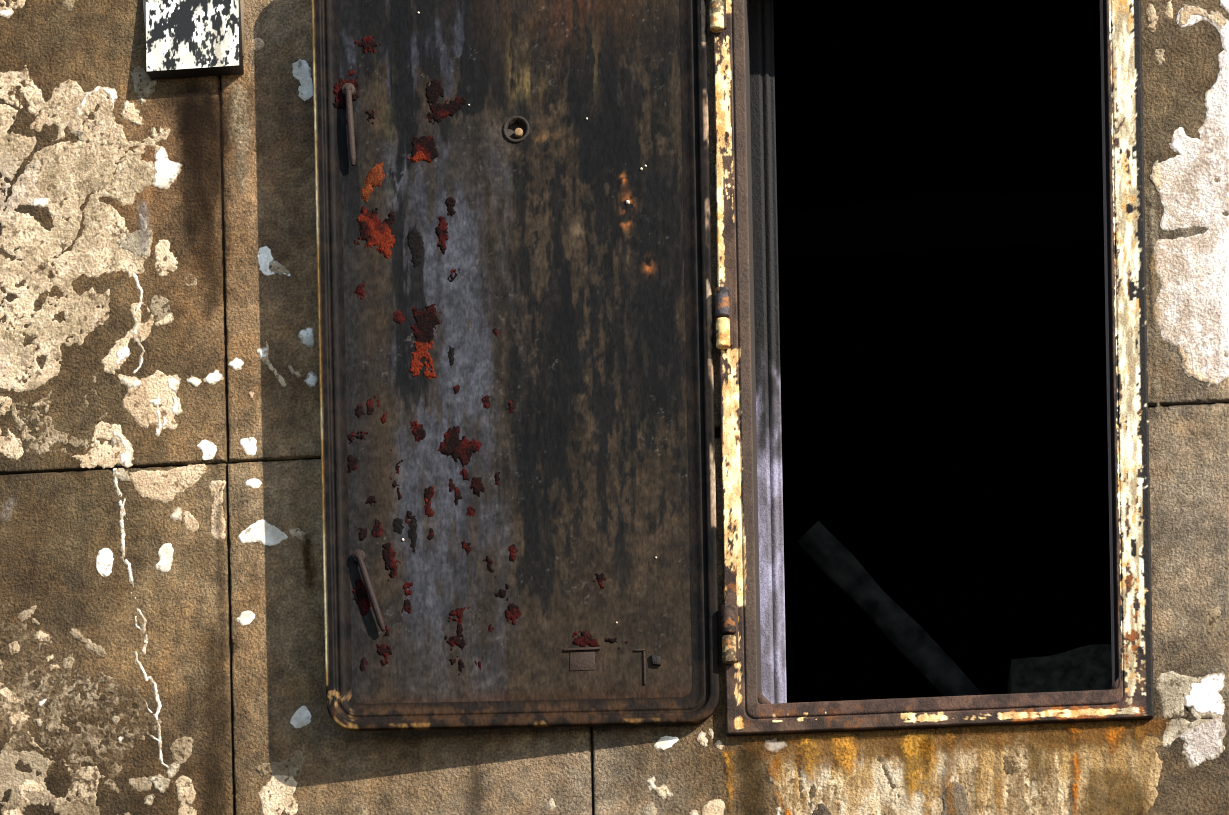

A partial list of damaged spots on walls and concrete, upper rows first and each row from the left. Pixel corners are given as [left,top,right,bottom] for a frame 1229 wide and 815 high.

peeling [0,0,26,18]
crack [132,214,147,373]
peeling [0,59,318,546]
rust [354,162,395,259]
rust [393,304,441,379]
rust [435,194,456,255]
peeling [1146,0,1229,388]
rust [389,426,500,540]
crack [113,468,169,768]
peeling [0,605,197,815]
peeling [764,671,1226,815]
rust [1031,719,1168,815]